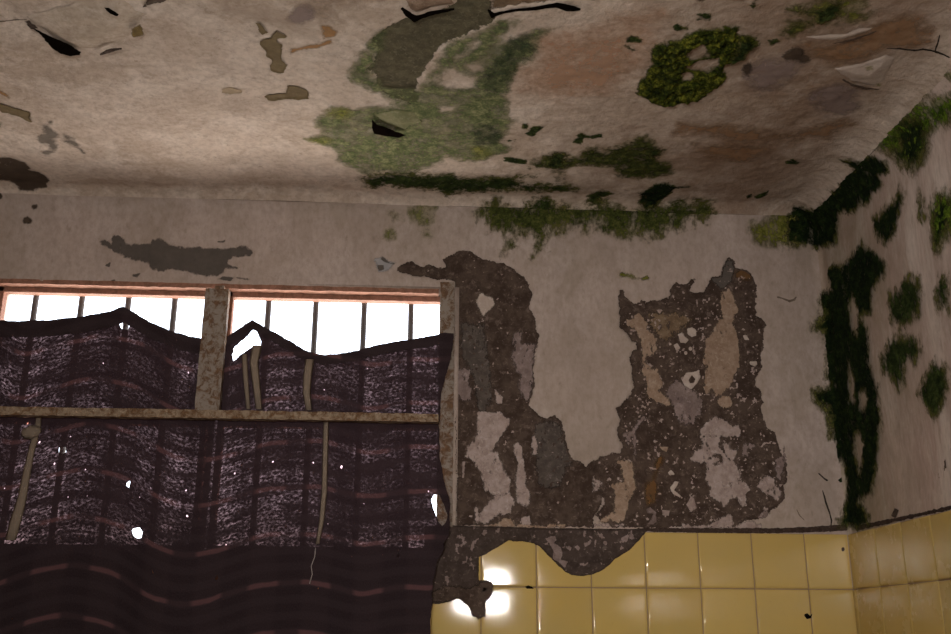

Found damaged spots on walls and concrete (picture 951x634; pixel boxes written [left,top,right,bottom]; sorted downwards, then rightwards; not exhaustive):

peeling [0,104,32,122]
peeling [256,23,288,73]
peeling [264,86,309,101]
spalling [367,0,581,138]
damp [478,35,536,90]
spalling [397,250,787,568]